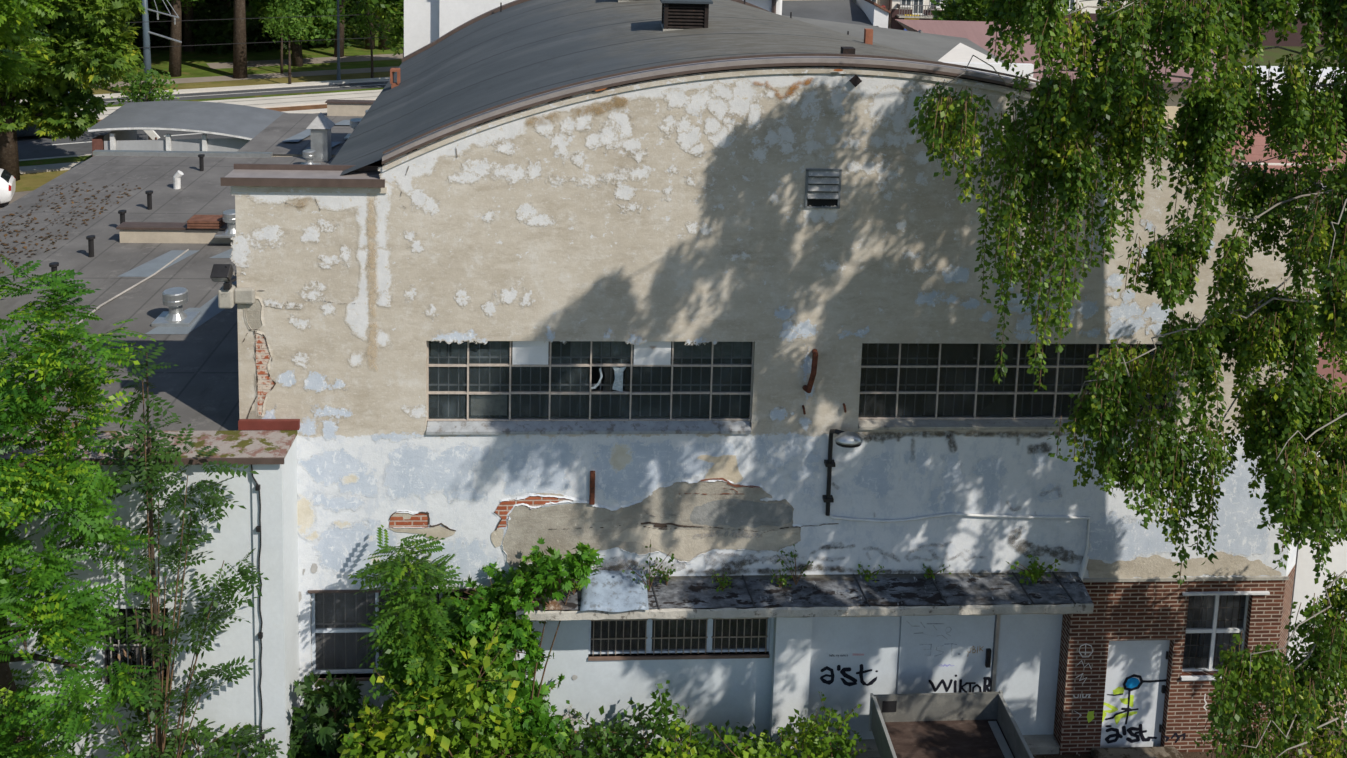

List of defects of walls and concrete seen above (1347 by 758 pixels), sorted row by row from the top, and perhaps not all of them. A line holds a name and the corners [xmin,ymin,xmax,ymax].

peeling [1088,176,1117,251]
flaking render [229,69,936,590]
peeling [898,219,1174,343]
peeling [968,455,1008,514]